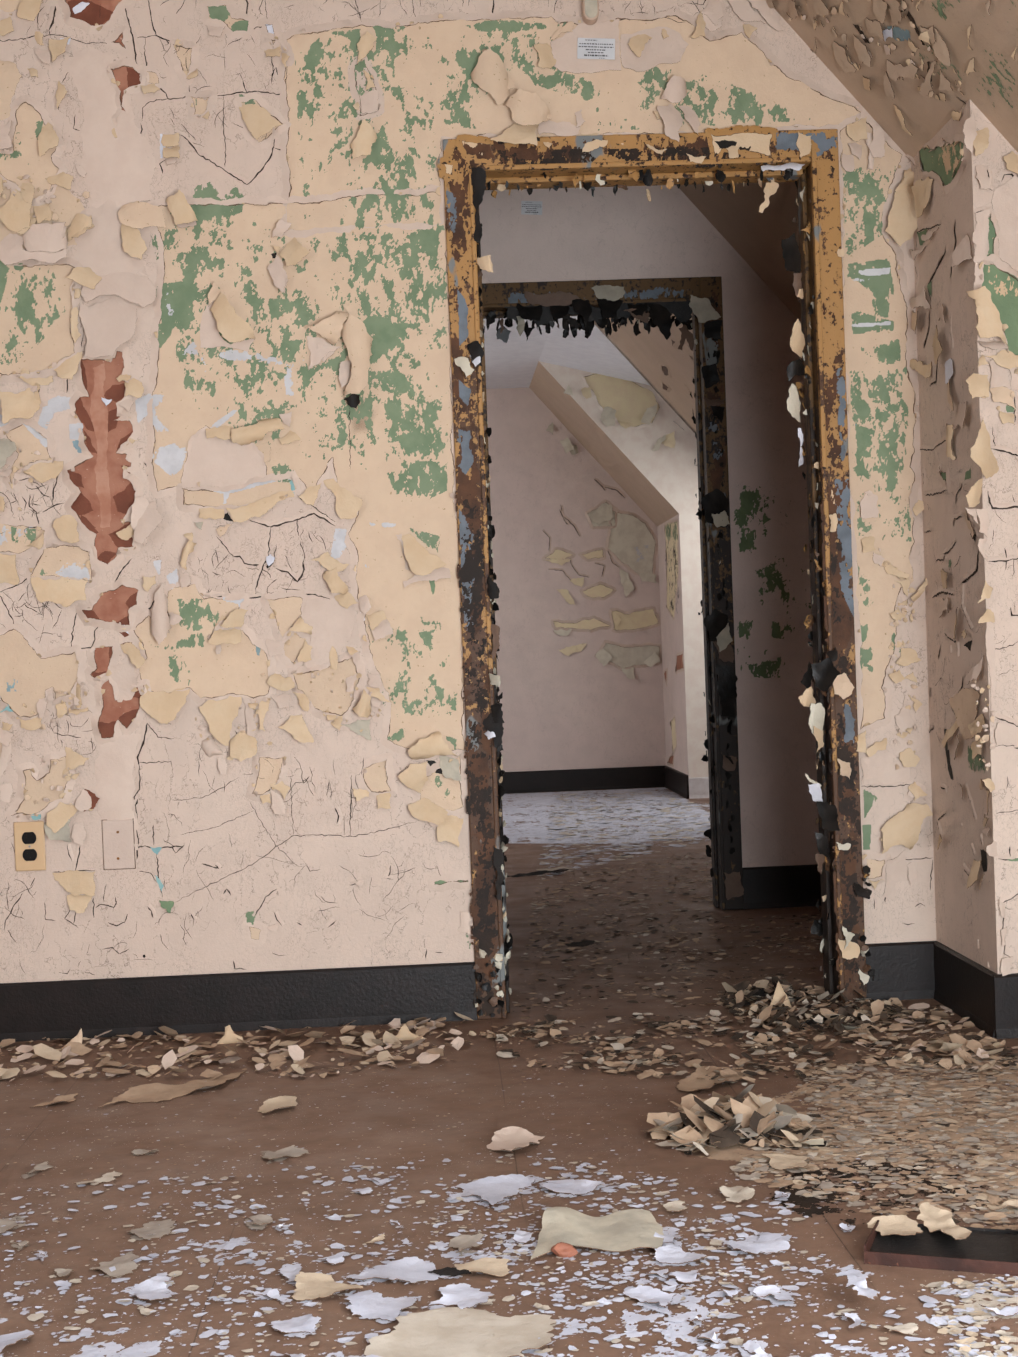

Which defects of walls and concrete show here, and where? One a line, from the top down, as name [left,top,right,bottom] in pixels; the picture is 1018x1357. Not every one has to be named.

crack [0,0,581,185]
crack [915,166,1018,386]
crack [991,397,1018,456]
crack [0,476,63,534]
crack [0,561,98,659]
crack [112,556,132,582]
crack [198,509,337,600]
peeling [0,0,1018,1017]
crack [920,436,1018,749]
crack [44,711,95,761]
crack [0,721,441,975]
crack [998,847,1018,909]